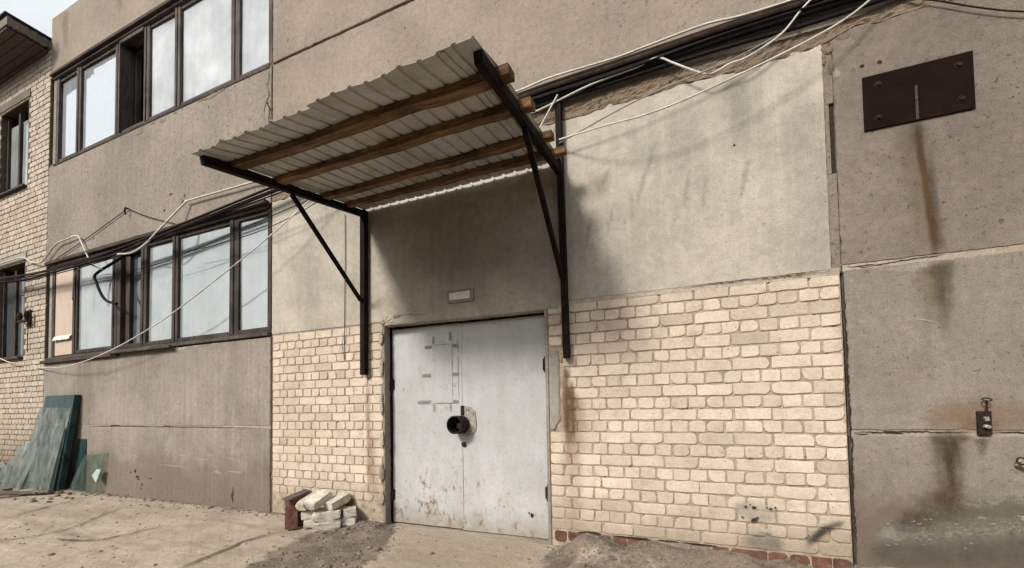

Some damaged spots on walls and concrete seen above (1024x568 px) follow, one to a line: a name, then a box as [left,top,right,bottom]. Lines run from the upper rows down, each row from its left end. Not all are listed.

rust [919,145,935,243]